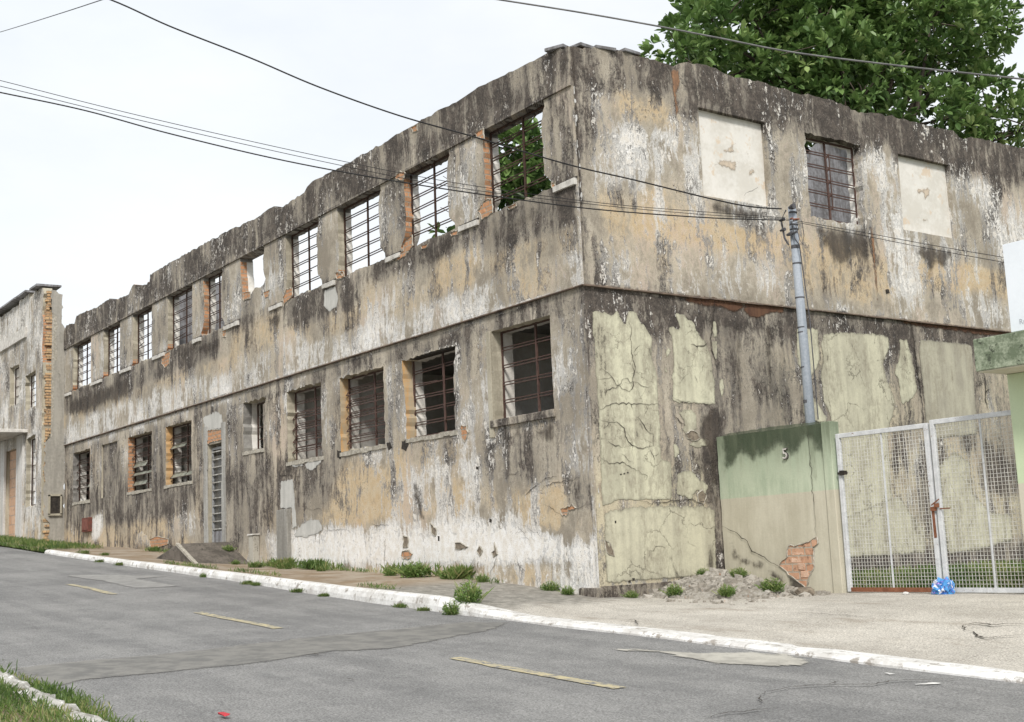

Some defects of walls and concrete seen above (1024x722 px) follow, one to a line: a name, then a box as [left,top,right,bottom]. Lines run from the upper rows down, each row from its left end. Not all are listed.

leakage [715,204,756,219]
leakage [819,229,867,262]
leakage [920,247,951,268]
crack [694,302,718,371]
leakage [70,379,127,414]
crack [601,321,699,476]
leakage [701,409,823,482]
crack [640,498,712,506]
flaking render [401,535,413,560]
spalling [455,541,498,558]
flaking render [779,537,819,587]